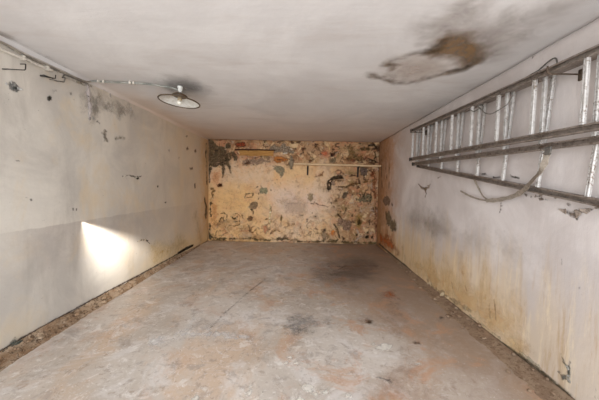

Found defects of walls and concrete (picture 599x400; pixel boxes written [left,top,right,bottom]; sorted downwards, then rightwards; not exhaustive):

water stain [424,34,483,74]
water stain [205,139,237,183]
flaking render [242,143,294,176]
flaking render [231,186,268,222]
flaking render [335,207,353,240]
flaking render [342,191,372,203]
flaking render [559,205,599,220]